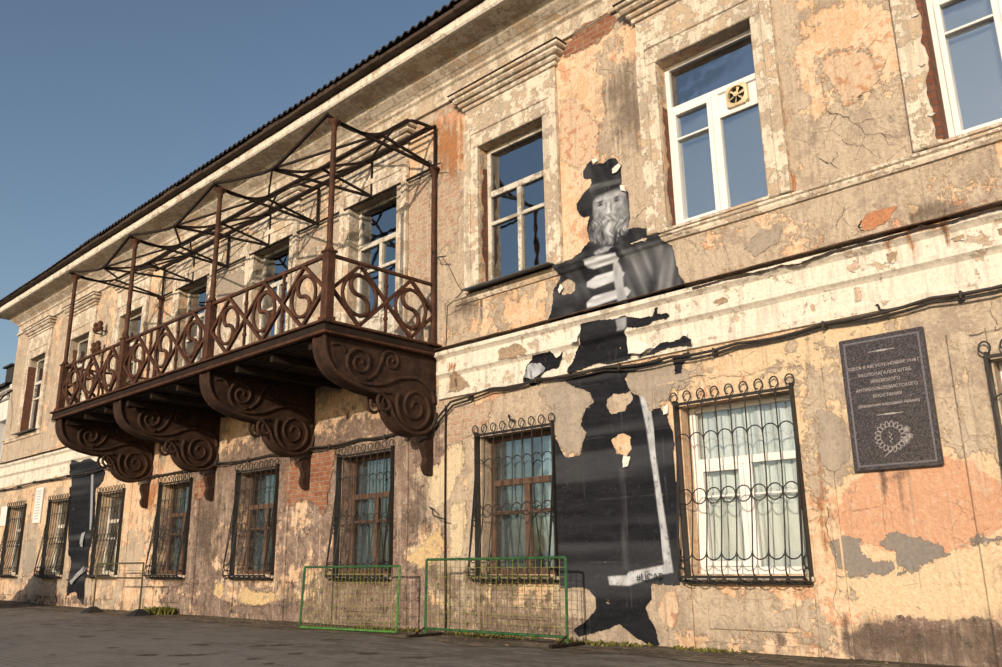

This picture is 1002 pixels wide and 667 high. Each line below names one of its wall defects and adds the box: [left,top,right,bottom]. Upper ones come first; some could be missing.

flaking render [563,13,620,59]
flaking render [819,45,886,107]
flaking render [912,0,949,139]
flaking render [558,93,600,170]
peeling [744,224,783,257]
flaking render [858,206,898,232]
flaking render [283,448,335,514]
flaking render [404,442,468,569]
peeling [829,531,1002,579]